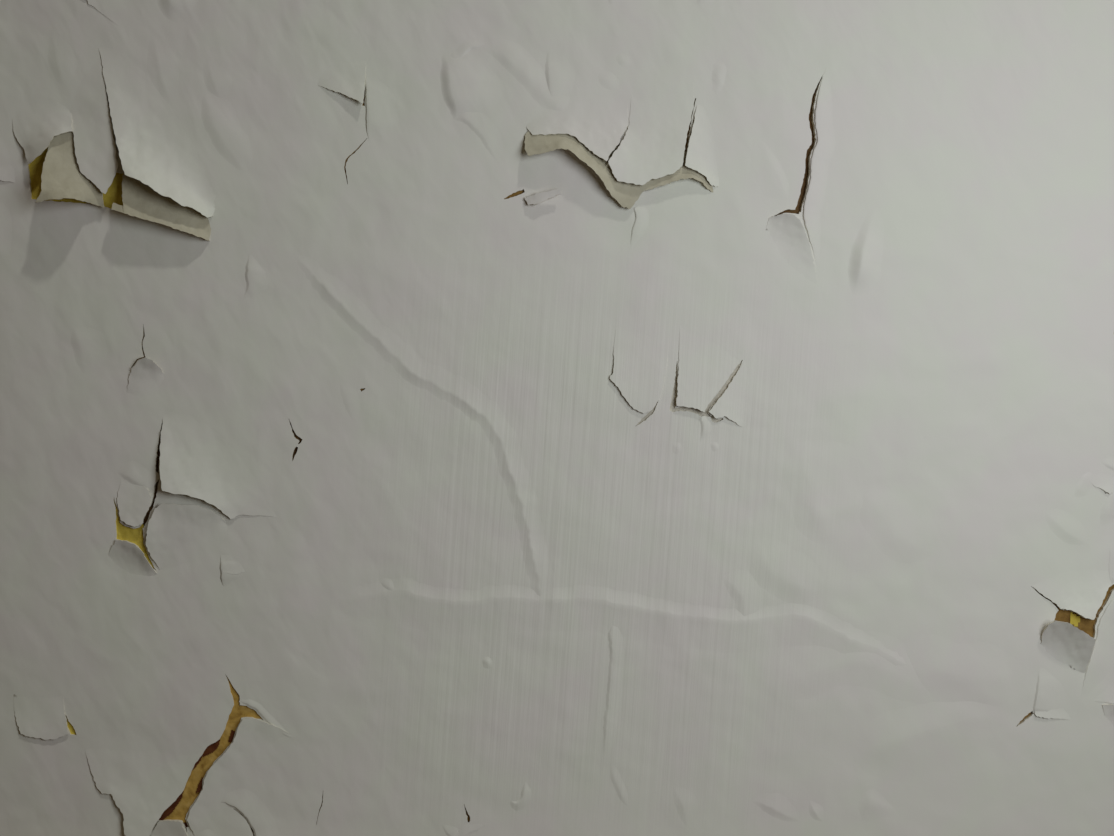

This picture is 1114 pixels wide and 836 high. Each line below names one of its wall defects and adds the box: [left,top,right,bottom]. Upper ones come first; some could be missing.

peeling [12,46,216,241]
peeling [505,189,561,205]
peeling [524,81,719,249]
crack [750,66,836,284]
peeling [670,326,750,452]
peeling [108,412,276,586]
peeling [1032,540,1114,725]
peeling [14,694,76,740]
peeling [85,677,295,836]